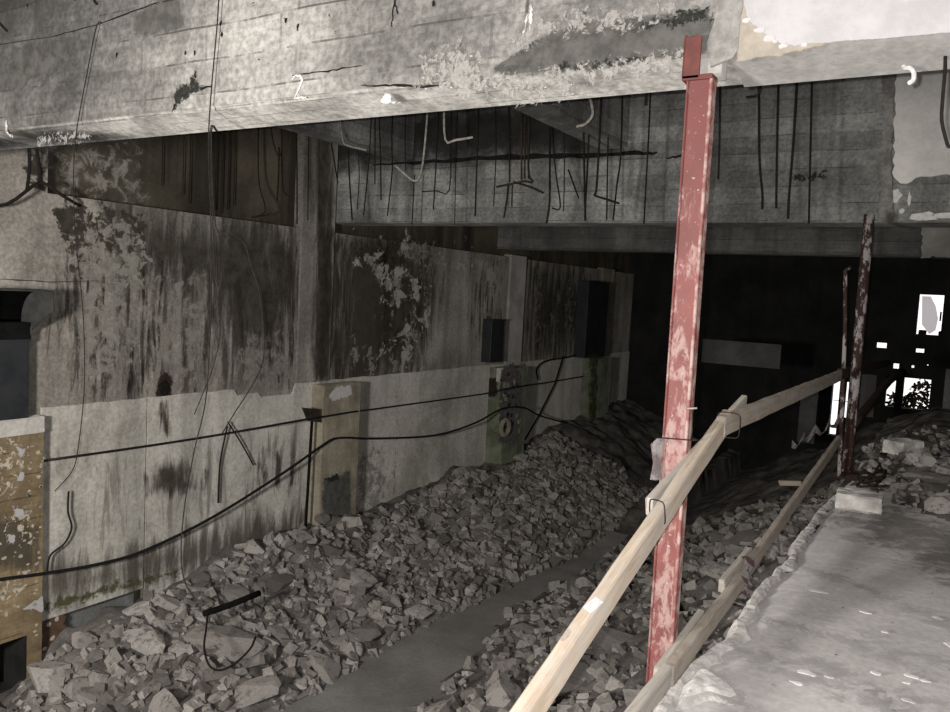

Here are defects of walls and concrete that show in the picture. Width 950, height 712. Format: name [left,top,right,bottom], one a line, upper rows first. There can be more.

leakage [408,36,620,160]
spalling [493,1,714,87]
peeling [737,0,826,62]
peeling [892,69,950,221]
leakage [47,203,299,401]
leakage [313,140,435,382]
leakage [526,253,586,358]
peeling [0,438,67,654]
leakage [52,446,305,599]
leakage [253,430,299,488]